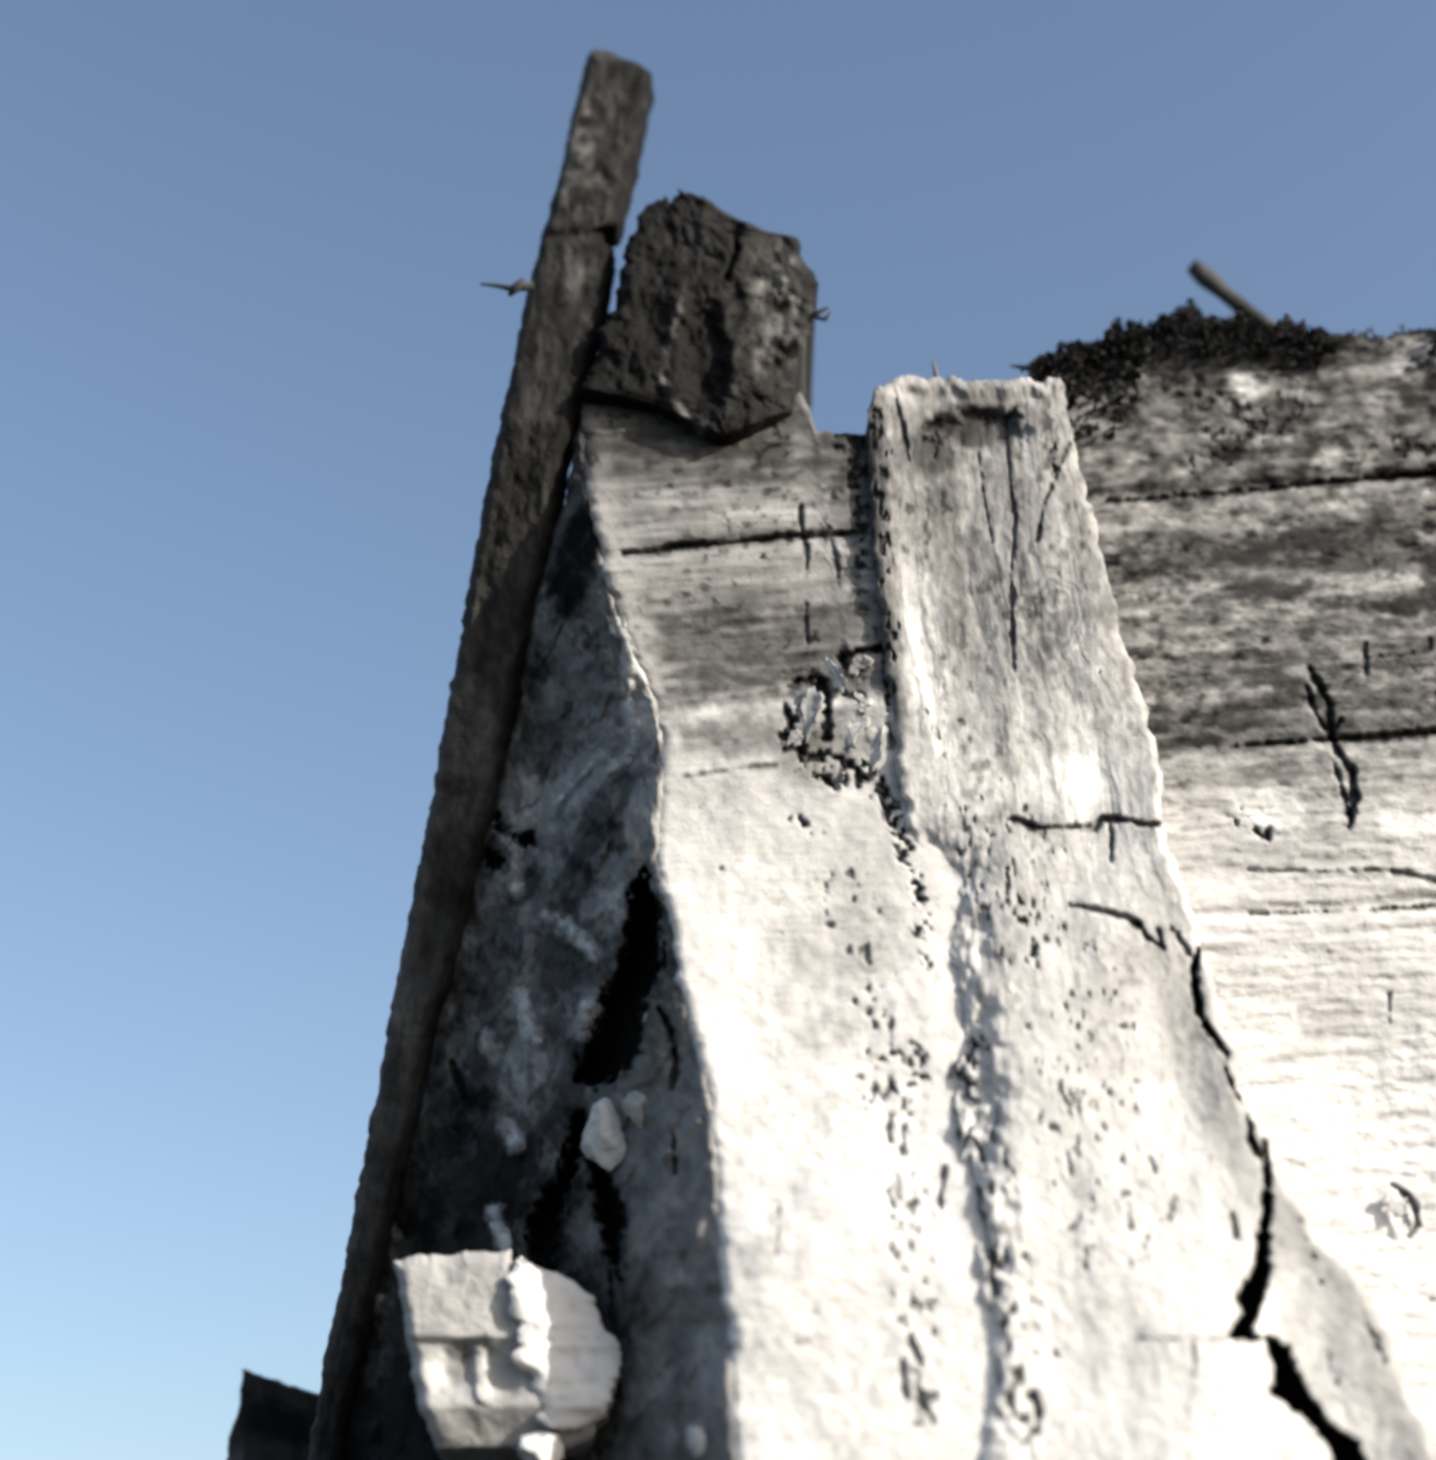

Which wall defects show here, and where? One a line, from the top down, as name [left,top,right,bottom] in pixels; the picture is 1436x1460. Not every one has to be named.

crack [622,507,844,575]
spalling [778,613,913,862]
crack [1236,667,1430,828]
crack [1011,815,1160,849]
spalling [846,944,871,964]
spalling [853,985,893,1030]
crack [1069,903,1219,1046]
spalling [856,1041,929,1156]
spalling [888,1173,925,1231]
crack [1398,1189,1420,1237]
crack [1228,1079,1364,1460]
spalling [912,1370,936,1426]